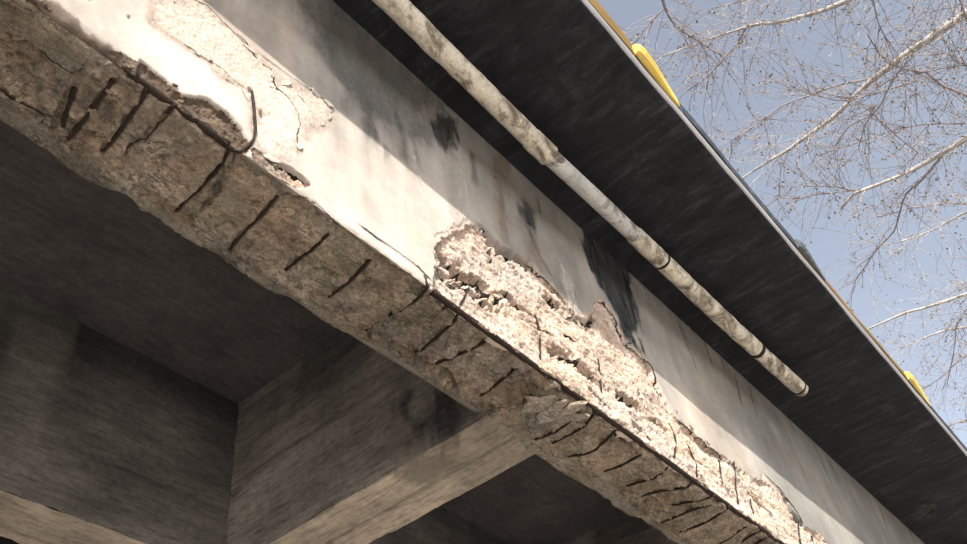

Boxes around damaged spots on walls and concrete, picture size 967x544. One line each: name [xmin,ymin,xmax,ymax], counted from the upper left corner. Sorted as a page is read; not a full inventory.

spalling [0,31,69,132]
peeling [149,0,334,189]
leakage [303,0,459,179]
spalling [48,41,826,544]